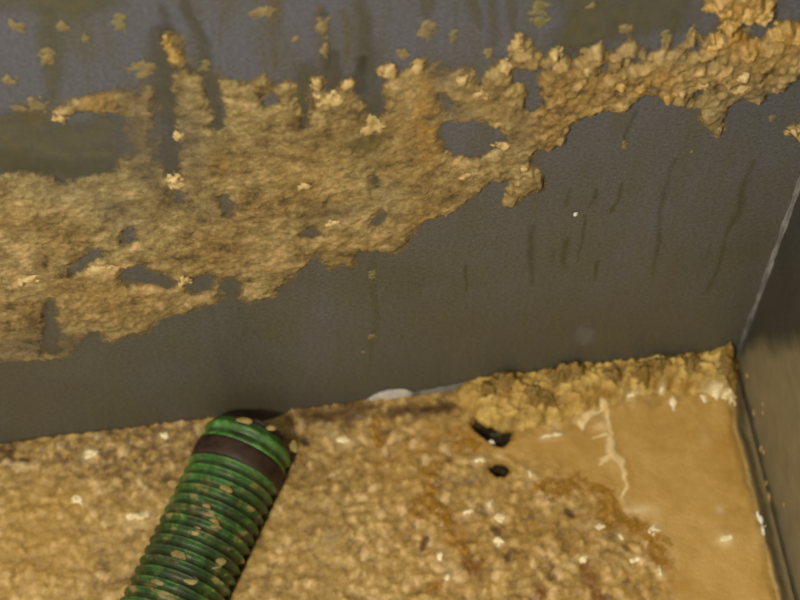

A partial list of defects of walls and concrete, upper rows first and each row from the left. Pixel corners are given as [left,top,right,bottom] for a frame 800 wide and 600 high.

damp [154,7,175,127]
damp [181,0,220,130]
peeling [0,0,800,361]
crack [577,398,629,499]